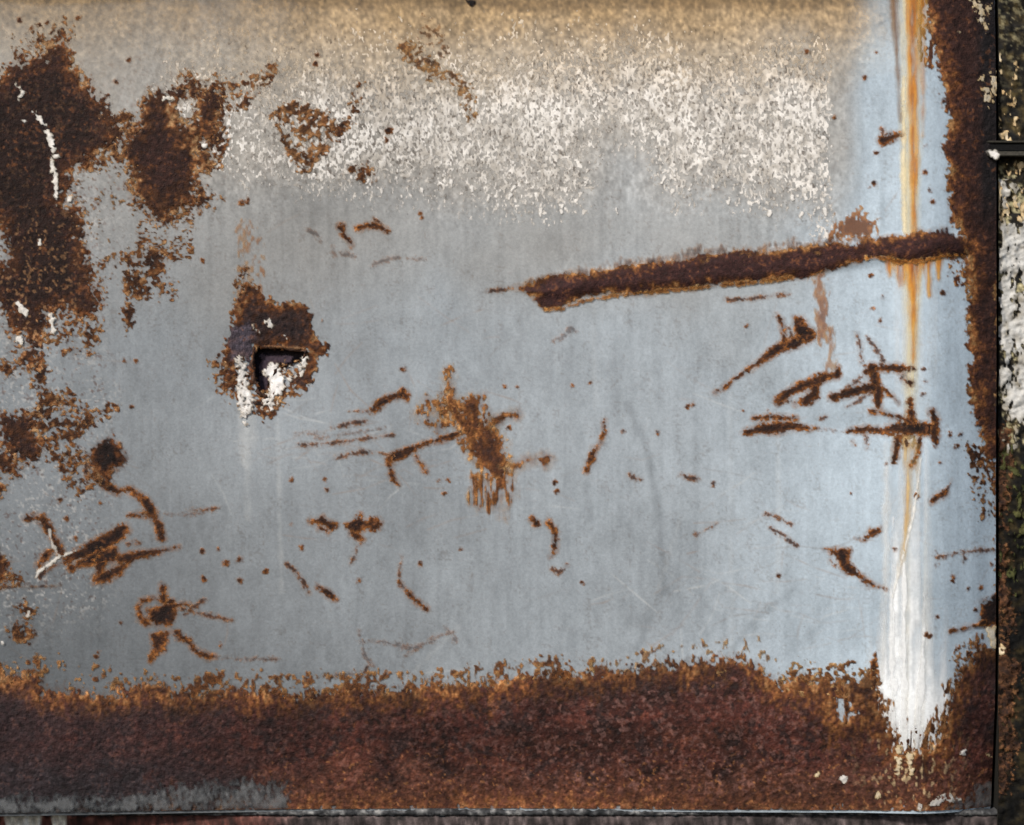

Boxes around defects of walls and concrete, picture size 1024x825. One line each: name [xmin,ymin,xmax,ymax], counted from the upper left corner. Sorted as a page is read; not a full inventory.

rust [269,80,367,174]
rust [0,15,278,502]
rust [508,0,1015,531]
rust [219,276,330,423]
rust [416,365,550,514]
rust [893,473,919,551]
rust [0,535,1024,814]